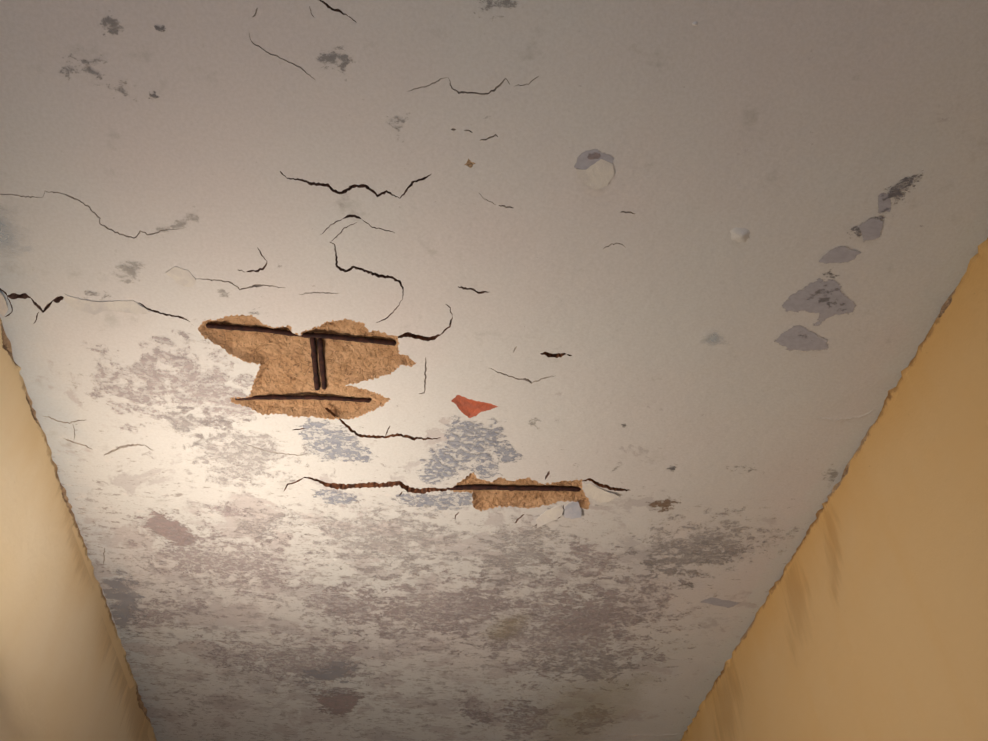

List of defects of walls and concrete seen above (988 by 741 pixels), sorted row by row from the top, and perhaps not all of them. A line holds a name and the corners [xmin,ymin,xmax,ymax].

peeling [575,149,614,169]
peeling [819,174,922,264]
crack [0,288,64,323]
crack [202,171,488,394]
peeling [774,278,856,351]
leakage [91,331,295,488]
spalling [198,314,416,465]
crack [246,444,448,496]
crack [325,408,440,441]
spalling [396,395,619,528]
crack [582,478,629,491]
leakage [103,499,785,741]